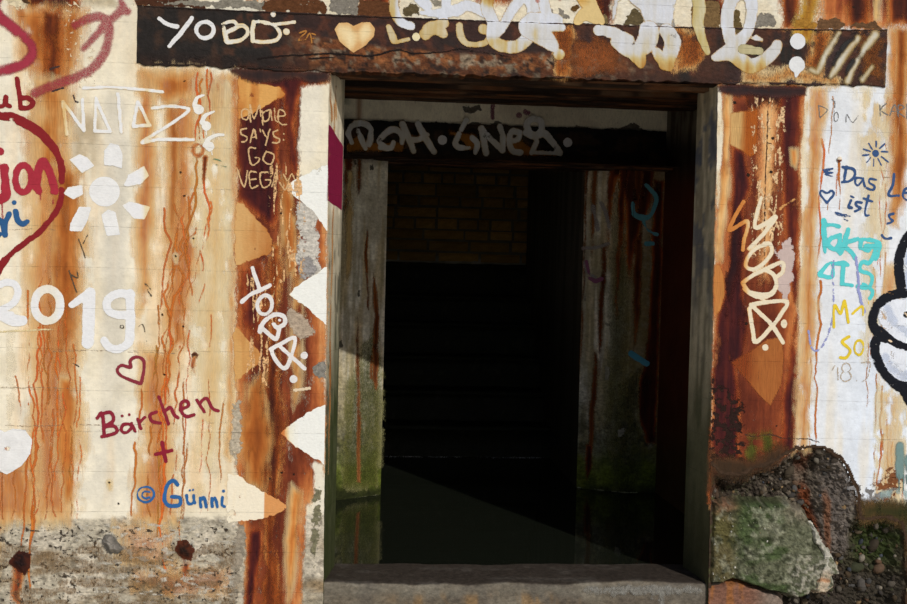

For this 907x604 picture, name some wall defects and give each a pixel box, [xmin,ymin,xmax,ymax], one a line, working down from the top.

rust [552,26,619,77]
rust [596,0,613,27]
rust [671,28,705,73]
rust [0,0,89,604]
rust [130,66,333,604]
rust [356,230,380,483]
rust [343,136,404,281]
rust [585,170,665,478]
rust [710,0,907,462]
rust [866,312,907,503]